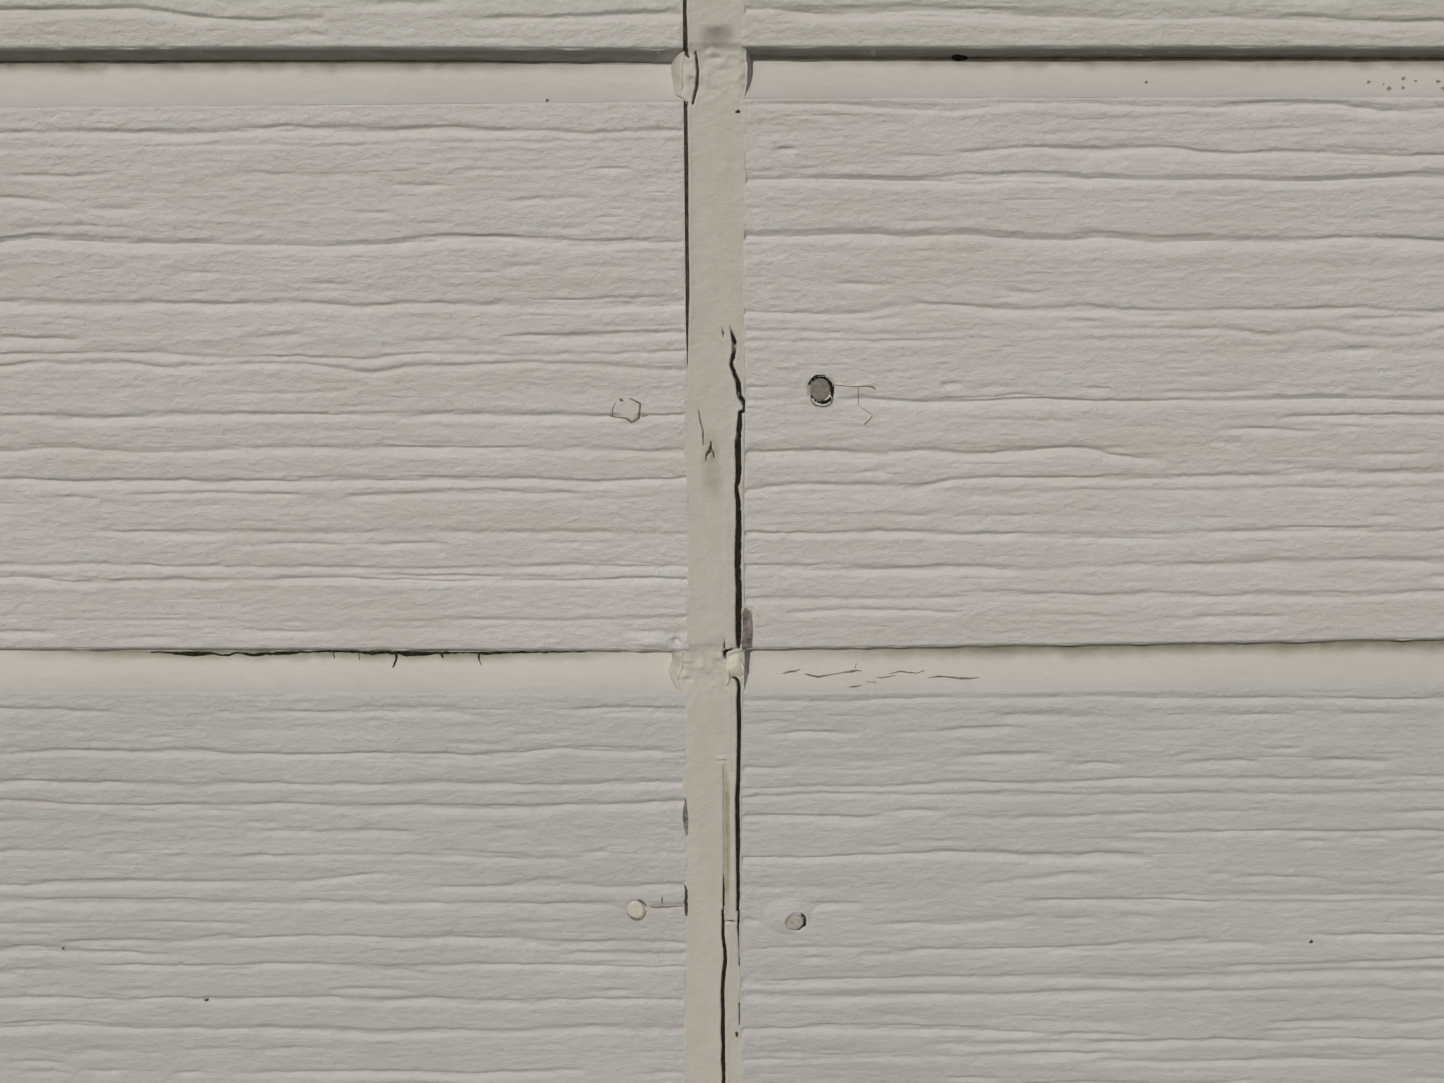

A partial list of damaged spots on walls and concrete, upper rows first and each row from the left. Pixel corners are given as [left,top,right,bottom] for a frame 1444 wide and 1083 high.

crack [810,383,876,424]
crack [683,0,745,1083]
crack [150,650,586,668]
crack [782,665,979,688]
crack [649,885,688,916]